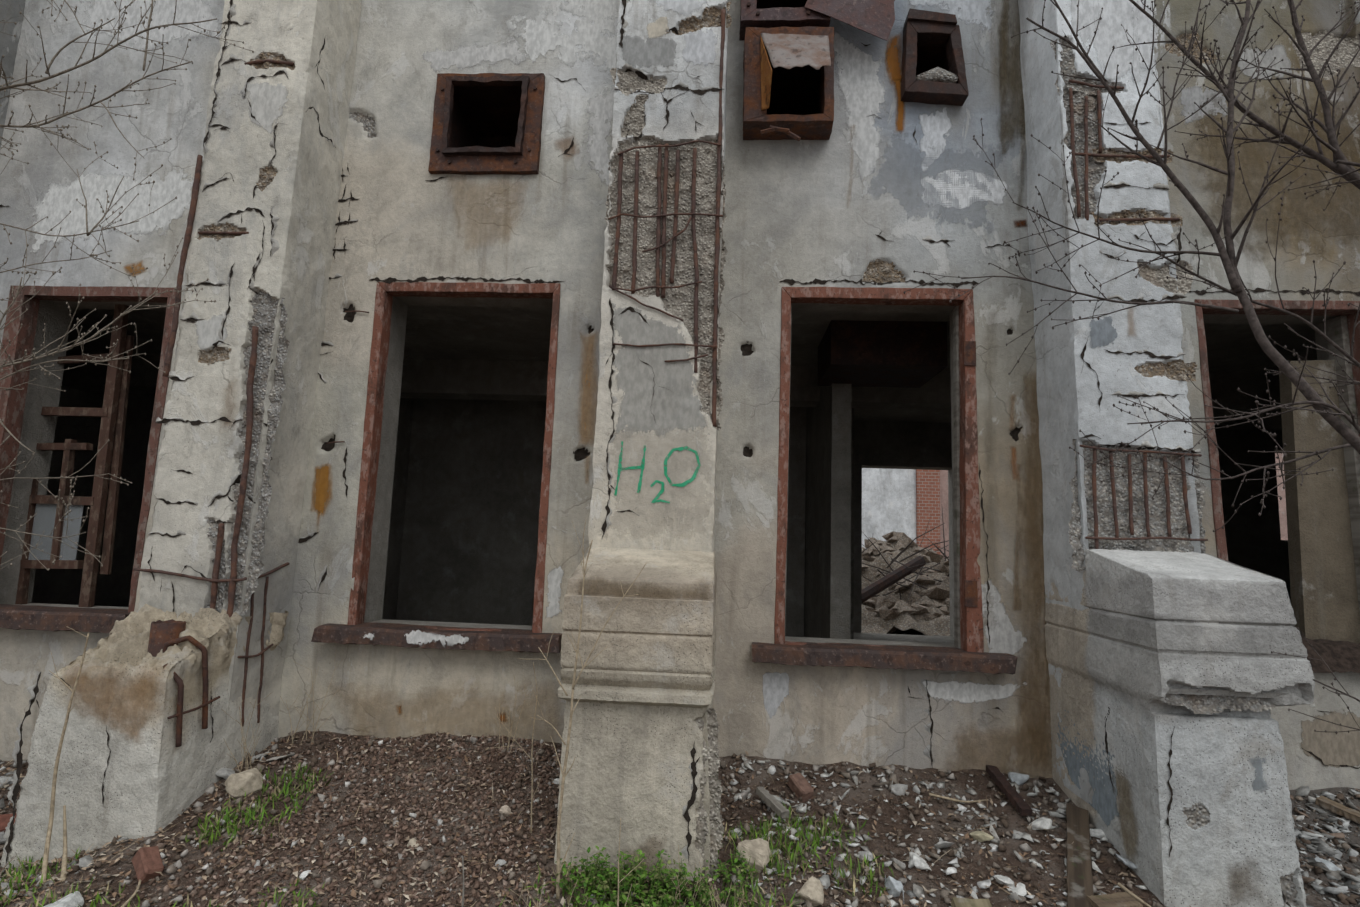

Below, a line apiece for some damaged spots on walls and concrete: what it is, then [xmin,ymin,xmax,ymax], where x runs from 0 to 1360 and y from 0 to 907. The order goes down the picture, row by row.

crack [180,0,566,348]
spalling [423,0,732,435]
rust [886,36,904,131]
peeling [1050,0,1360,227]
crack [167,371,194,381]
spalling [195,290,290,618]
crack [601,299,669,538]
spalling [1068,439,1208,572]
crack [3,671,75,864]
crack [681,742,700,861]
crack [1166,726,1175,857]
peeling [1301,710,1360,768]